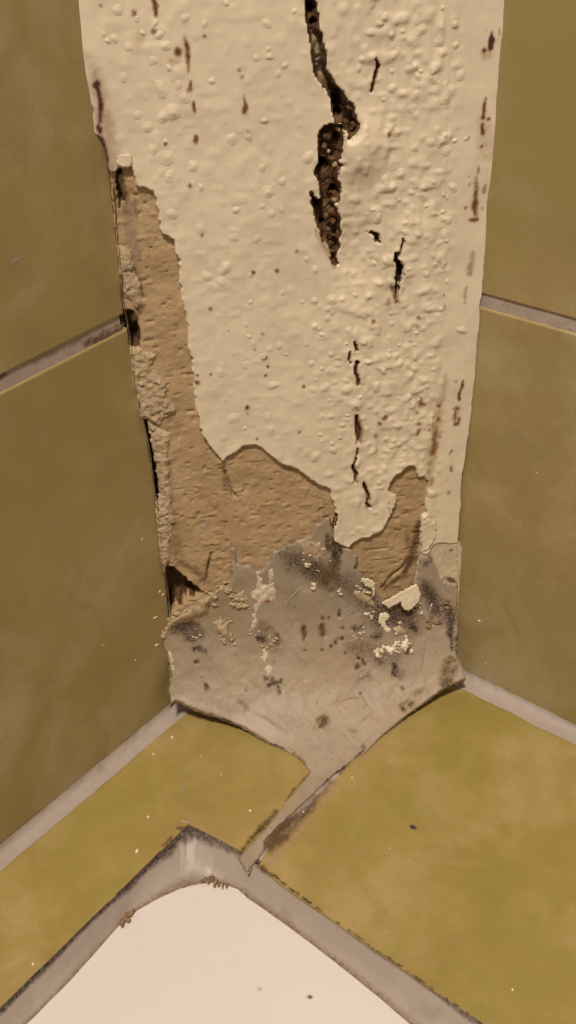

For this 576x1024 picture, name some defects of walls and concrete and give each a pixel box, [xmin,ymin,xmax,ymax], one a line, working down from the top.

crack [304,0,380,266]
crack [369,230,405,303]
peeling [110,154,336,616]
crack [348,341,360,386]
crack [351,414,372,508]
peeling [334,466,462,613]
leakage [169,621,207,663]
leakage [251,535,418,694]
peeling [375,625,409,658]
leakage [421,580,455,650]